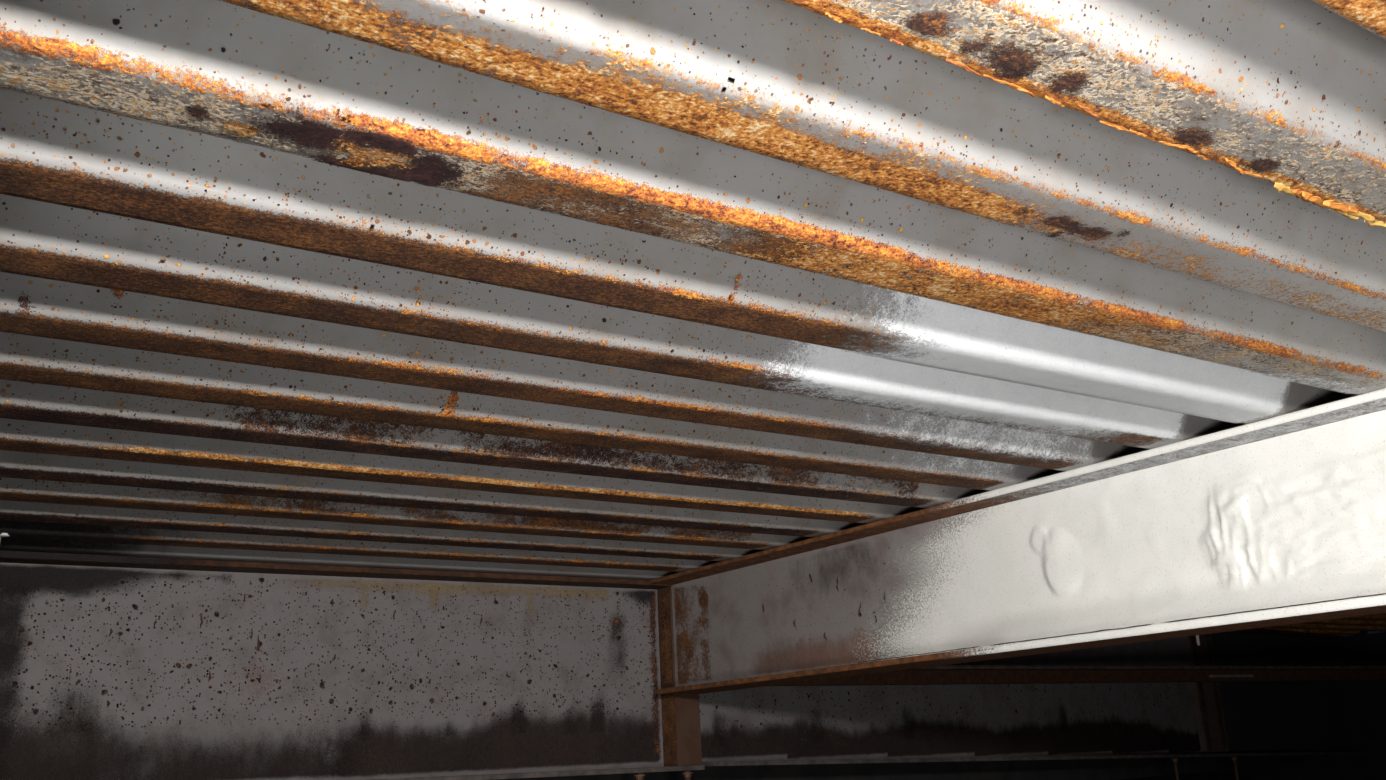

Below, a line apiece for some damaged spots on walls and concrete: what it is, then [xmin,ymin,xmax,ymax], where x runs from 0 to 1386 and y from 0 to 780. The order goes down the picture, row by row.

corrosion [0,0,1386,571]
damp [0,694,660,780]
corrosion [0,547,902,764]